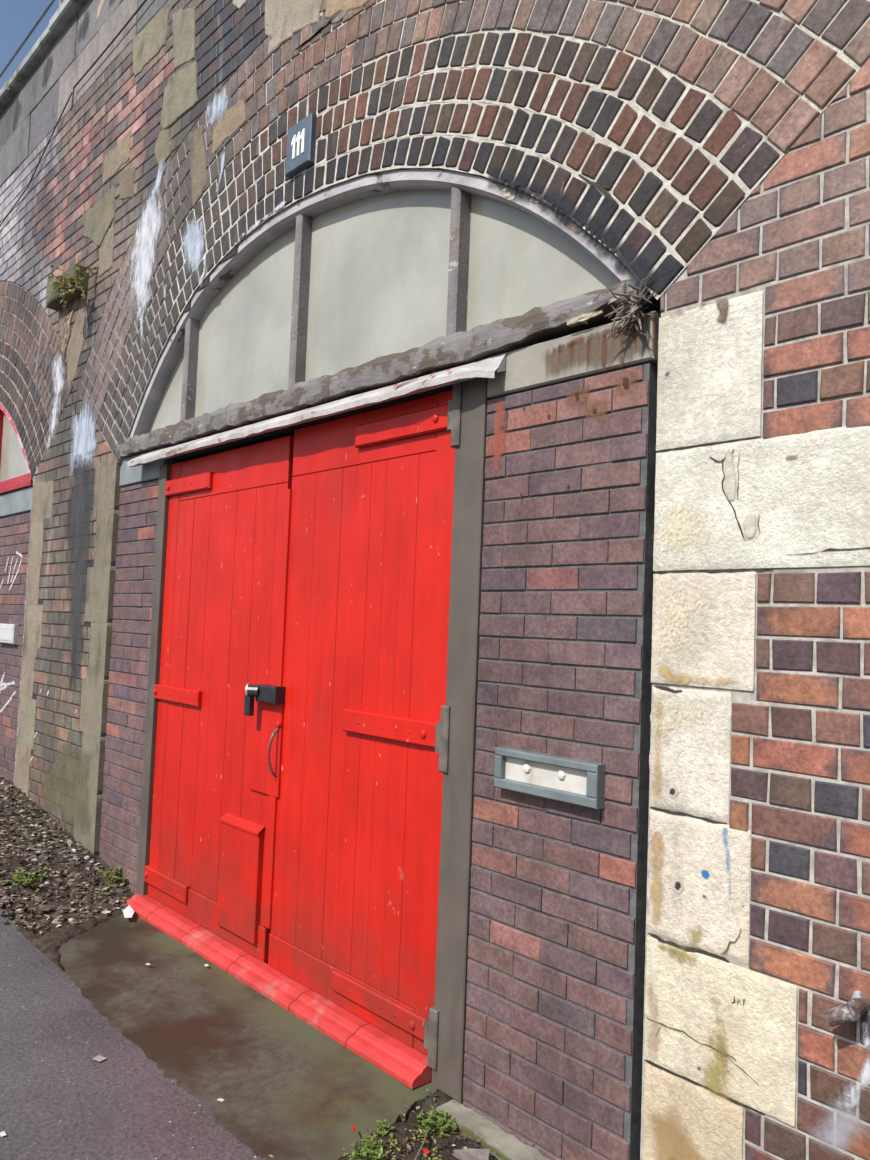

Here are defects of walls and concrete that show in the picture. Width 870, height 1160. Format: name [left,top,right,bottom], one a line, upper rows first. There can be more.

damp [130,161,167,336]
damp [183,220,206,285]
rust [546,313,656,392]
crack [709,449,760,540]
crack [793,547,870,555]
crack [646,1017,759,1086]
damp [825,1023,870,1144]